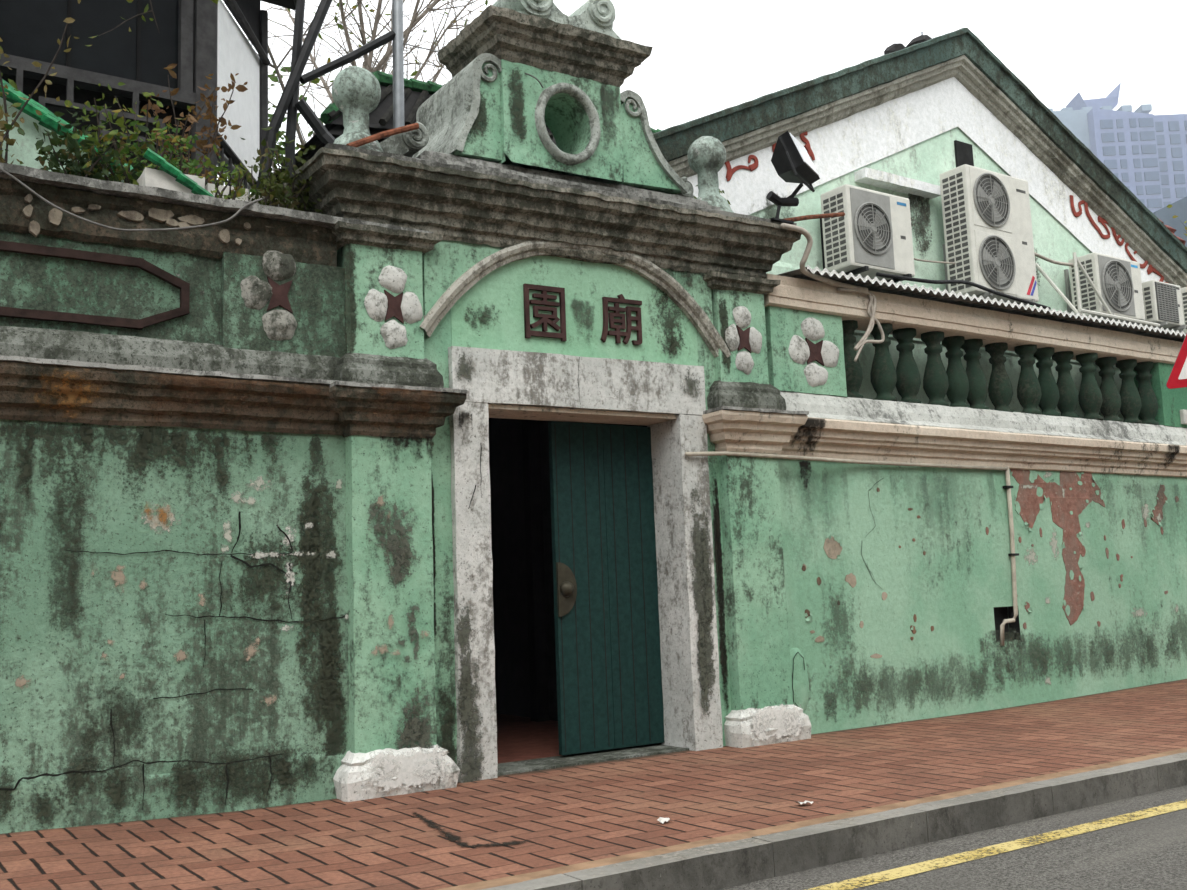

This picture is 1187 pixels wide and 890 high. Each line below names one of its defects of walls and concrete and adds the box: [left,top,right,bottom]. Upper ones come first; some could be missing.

corrosion [35,370,100,418]
damp [0,420,349,829]
crack [65,511,348,699]
damp [367,436,484,783]
damp [690,478,729,715]
damp [792,418,826,487]
flaking render [824,535,843,559]
damp [825,595,1187,714]
peeling [1010,469,1105,626]
peeling [1144,480,1179,535]
crack [0,709,282,810]